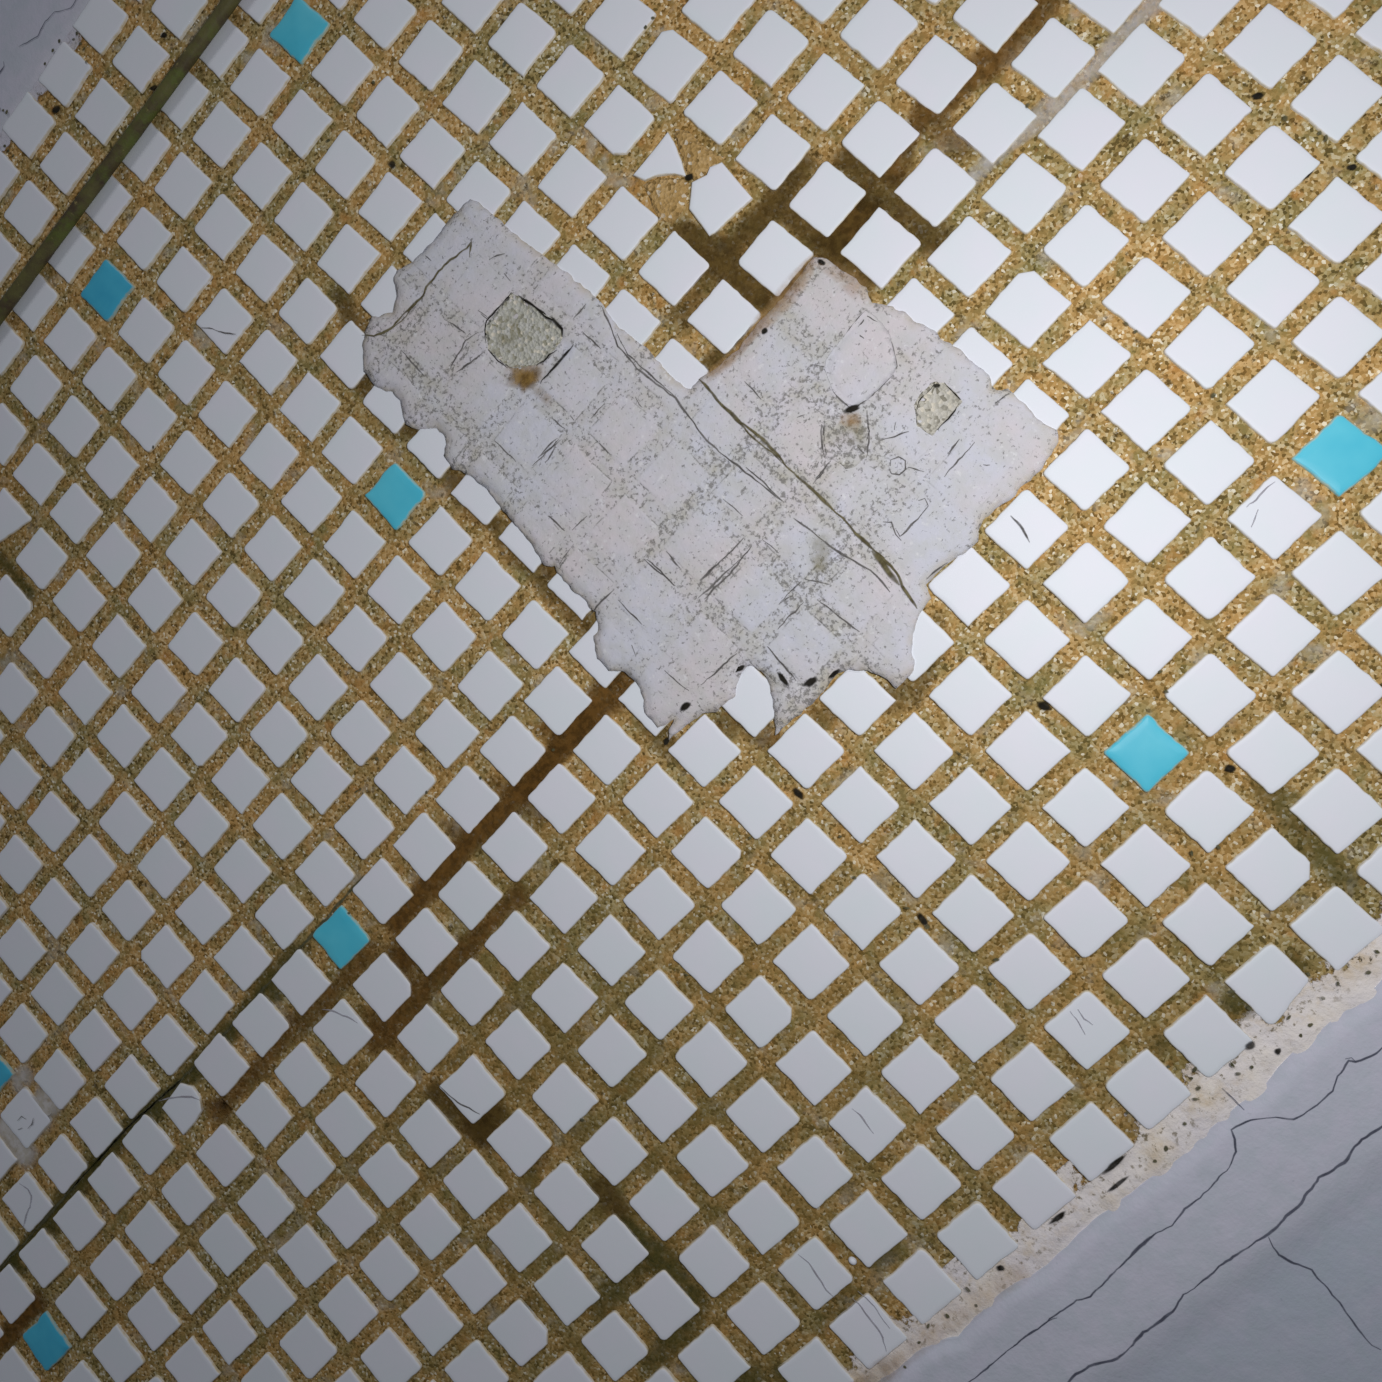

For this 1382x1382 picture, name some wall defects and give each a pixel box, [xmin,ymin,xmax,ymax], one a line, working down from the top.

crack [0,0,76,72]
water stain [1006,0,1160,151]
crack [495,304,988,690]
water stain [0,1119,34,1165]
water stain [12,1068,58,1118]
crack [969,1048,1382,1382]